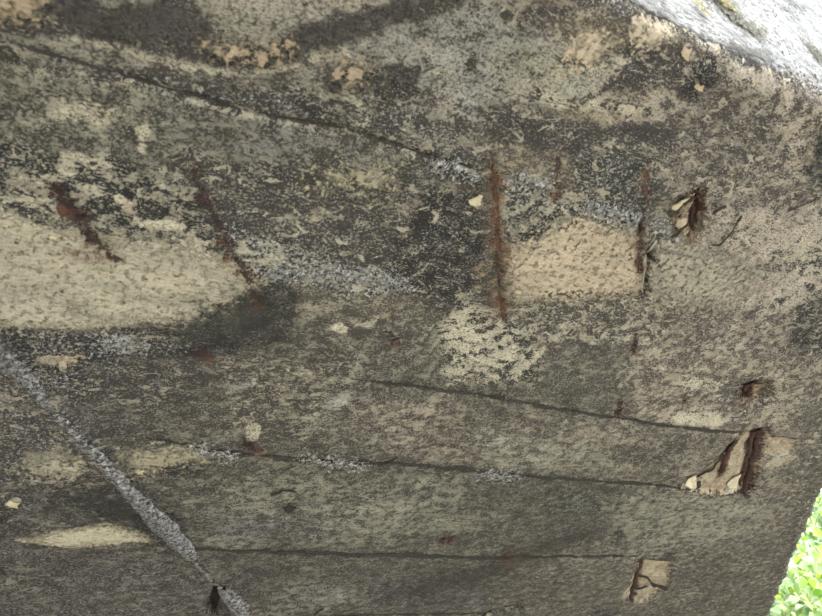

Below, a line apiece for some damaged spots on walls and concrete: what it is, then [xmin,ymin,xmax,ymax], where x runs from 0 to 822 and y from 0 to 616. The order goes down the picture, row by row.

corrosion [37,181,124,264]
corrosion [483,154,513,322]
peeling [495,183,786,328]
corrosion [631,159,652,274]
crack [270,490,296,513]
spalling [680,427,799,502]
spalling [618,558,672,604]